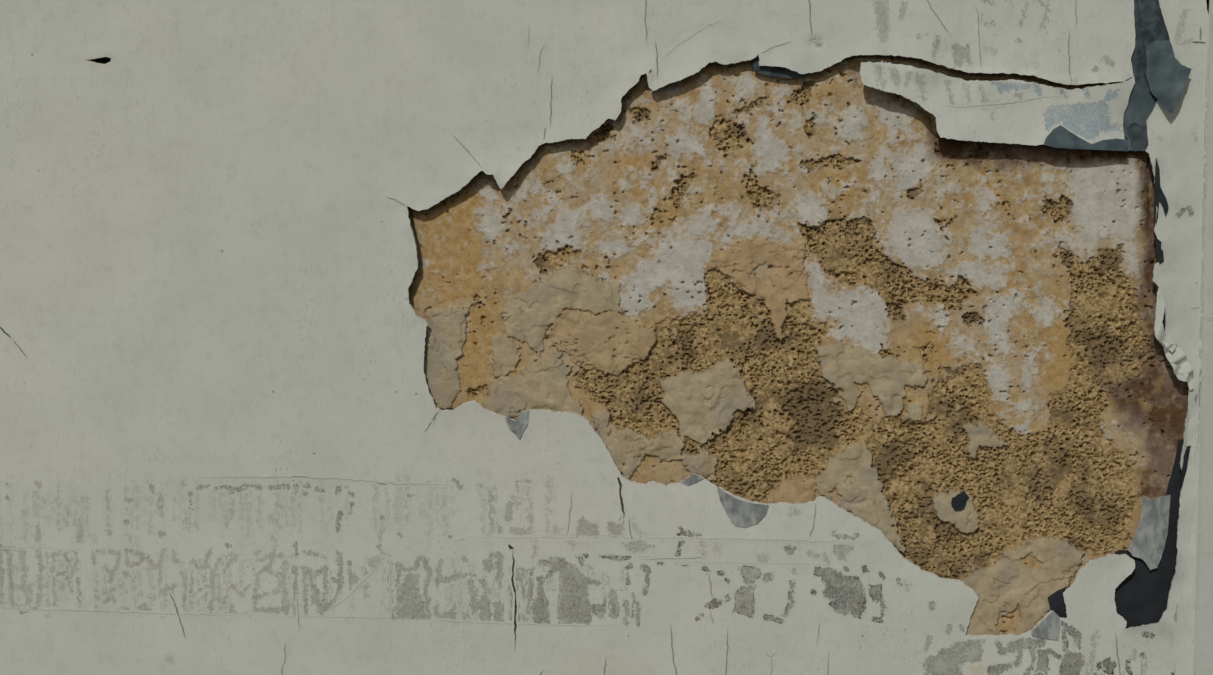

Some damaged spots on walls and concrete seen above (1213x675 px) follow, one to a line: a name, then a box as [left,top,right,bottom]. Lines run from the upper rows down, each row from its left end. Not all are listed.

crack [0,324,29,359]
spalling [404,0,1202,675]
crack [507,542,522,651]